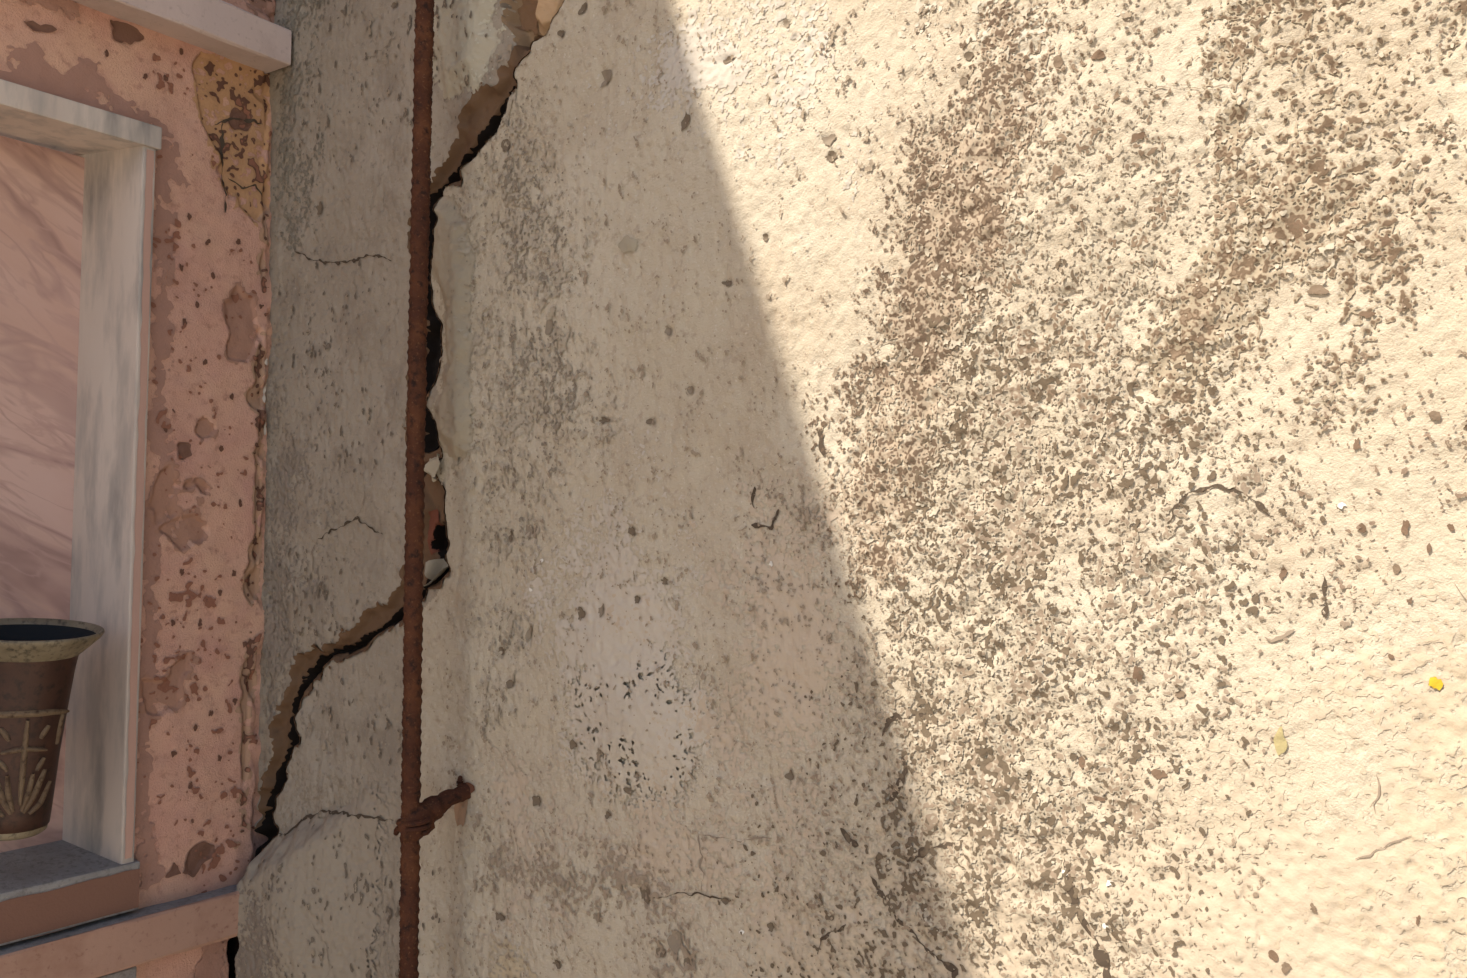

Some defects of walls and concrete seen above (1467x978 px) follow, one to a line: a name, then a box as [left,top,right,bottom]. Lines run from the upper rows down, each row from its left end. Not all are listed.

spalling [500,0,587,47]
peeling [138,48,272,893]
crack [254,35,542,857]
corrosion [427,509,443,555]
corrosion [454,782,475,826]
leakage [418,0,1467,978]